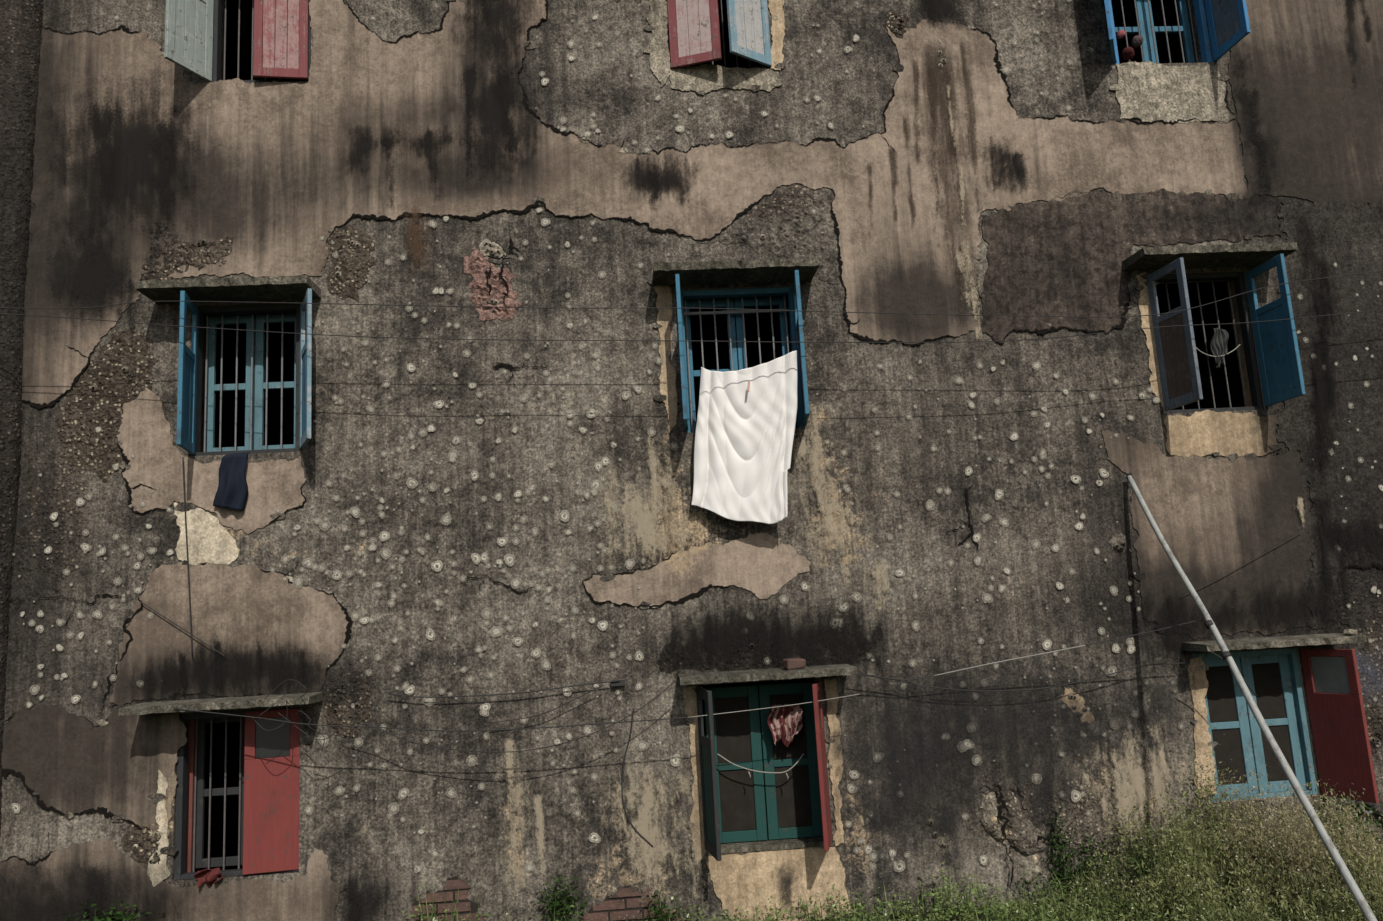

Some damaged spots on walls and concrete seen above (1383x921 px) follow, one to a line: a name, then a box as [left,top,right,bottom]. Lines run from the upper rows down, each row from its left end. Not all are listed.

damp [1346,0,1372,80]
damp [347,0,537,206]
damp [889,41,1025,234]
flaking render [22,0,1383,639]
damp [956,245,981,338]
damp [1297,496,1383,615]
flaking render [0,327,373,921]
crack [981,780,1095,890]
damp [1084,729,1189,842]